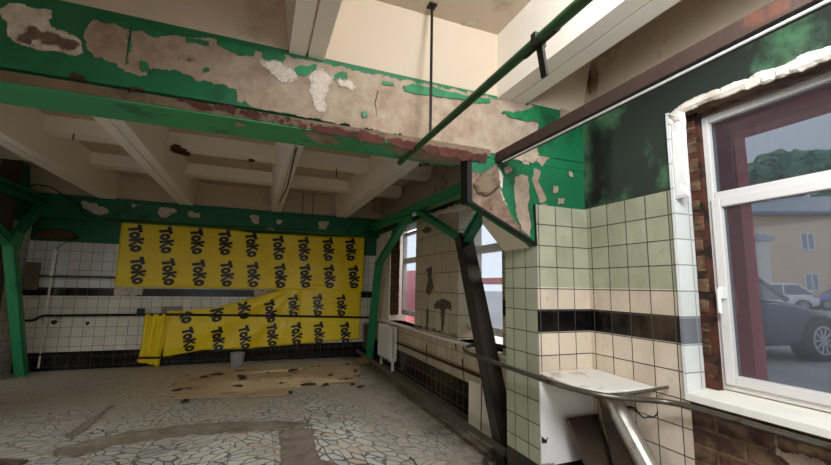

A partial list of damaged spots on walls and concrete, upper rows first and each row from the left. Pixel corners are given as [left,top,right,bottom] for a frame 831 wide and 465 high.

peeling [0,3,540,153]
corrosion [169,95,487,163]
spalling [170,144,191,156]
spalling [430,148,565,237]
peeling [81,201,109,215]
peeling [158,207,177,218]
peeling [775,447,826,465]